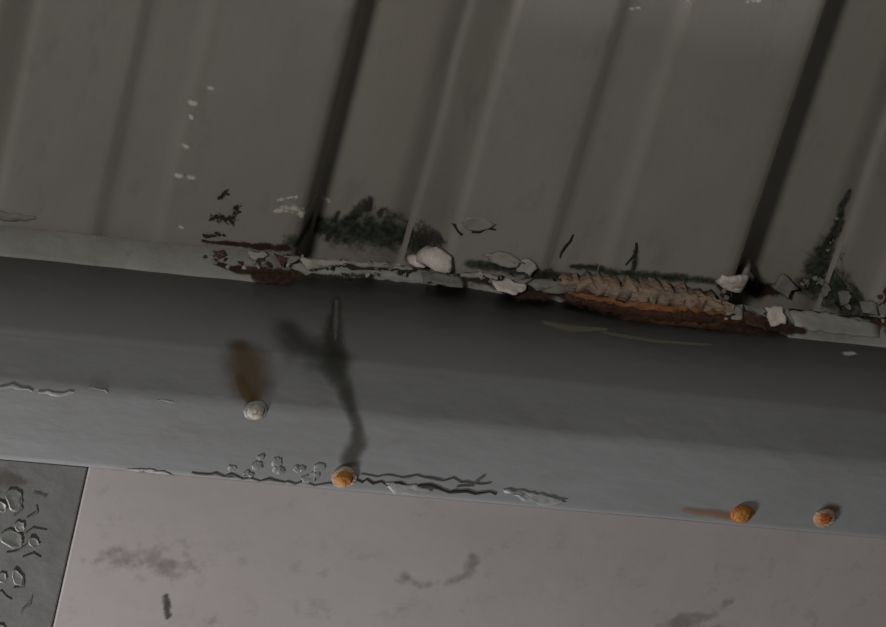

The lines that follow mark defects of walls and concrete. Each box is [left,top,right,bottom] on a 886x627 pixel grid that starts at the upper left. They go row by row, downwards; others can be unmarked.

damp [287,197,423,257]
peeling [283,225,585,301]
corrosion [526,259,807,336]